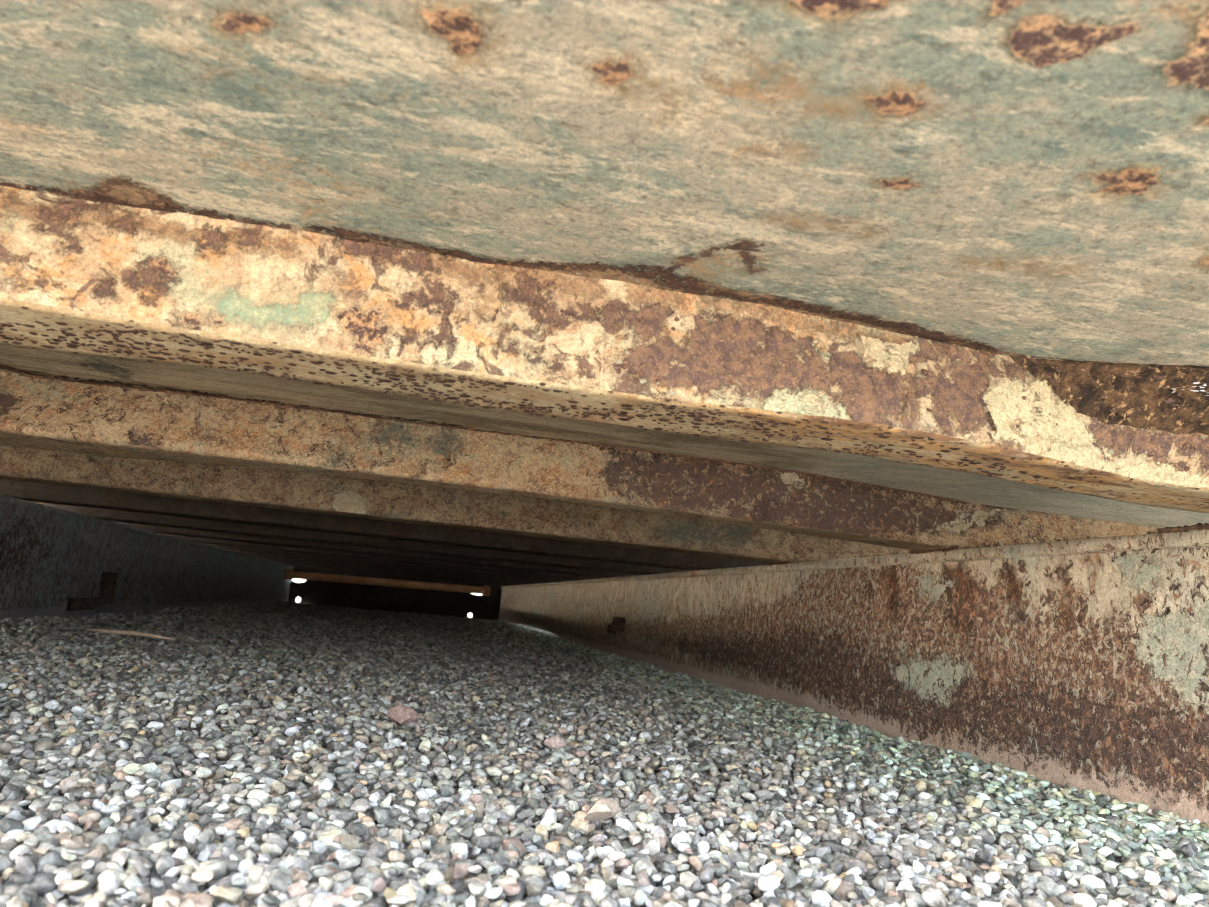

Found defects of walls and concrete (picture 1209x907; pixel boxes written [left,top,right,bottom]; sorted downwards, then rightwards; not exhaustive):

corrosion [417,3,498,65]
corrosion [590,54,642,91]
corrosion [789,0,891,23]
corrosion [863,84,929,118]
corrosion [985,0,1141,69]
corrosion [1160,11,1209,90]
corrosion [1086,165,1162,201]
corrosion [0,187,296,259]
crack [0,173,1003,355]
corrosion [0,238,1102,490]
corrosion [1084,415,1209,475]
corrosion [586,451,1209,811]